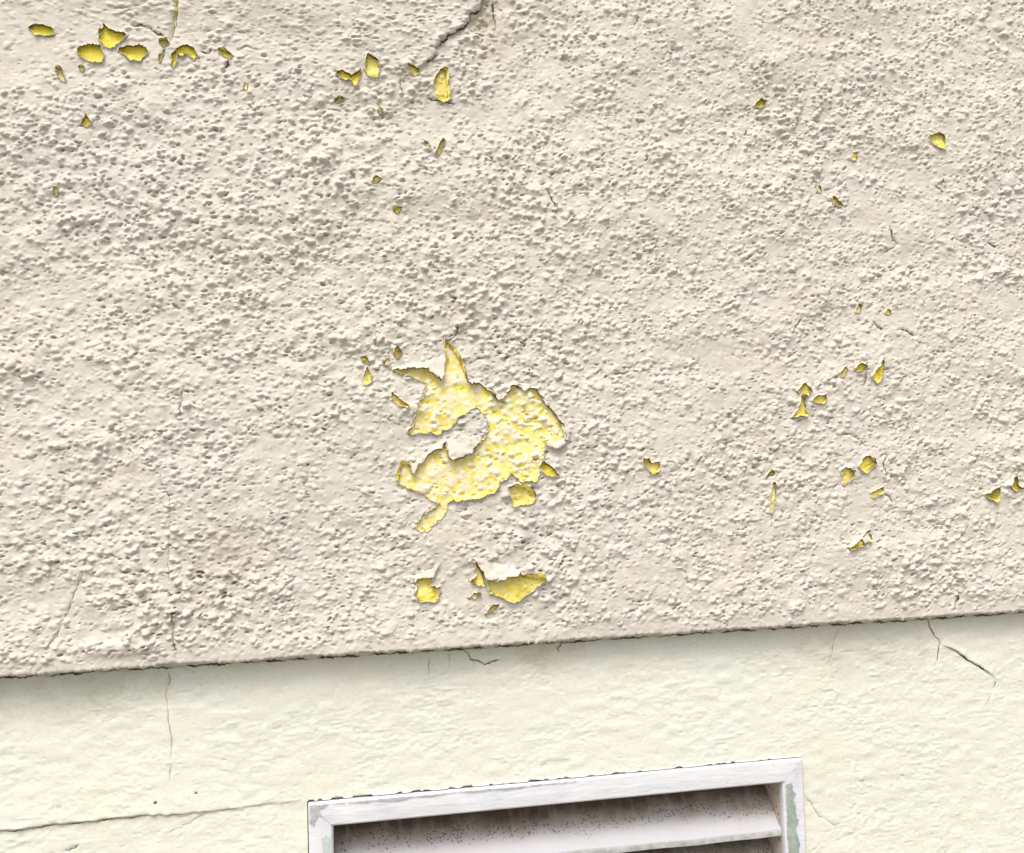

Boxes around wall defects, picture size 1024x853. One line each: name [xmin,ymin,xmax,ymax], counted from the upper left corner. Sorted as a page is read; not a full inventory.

peeling [27,23,56,37]
peeling [75,23,200,73]
peeling [335,52,382,86]
crack [427,0,496,63]
peeling [926,132,947,151]
peeling [790,381,827,419]
peeling [360,339,571,534]
peeling [838,453,877,486]
peeling [412,560,442,603]
peeling [467,557,547,616]
crack [928,620,996,701]
crack [4,801,298,851]